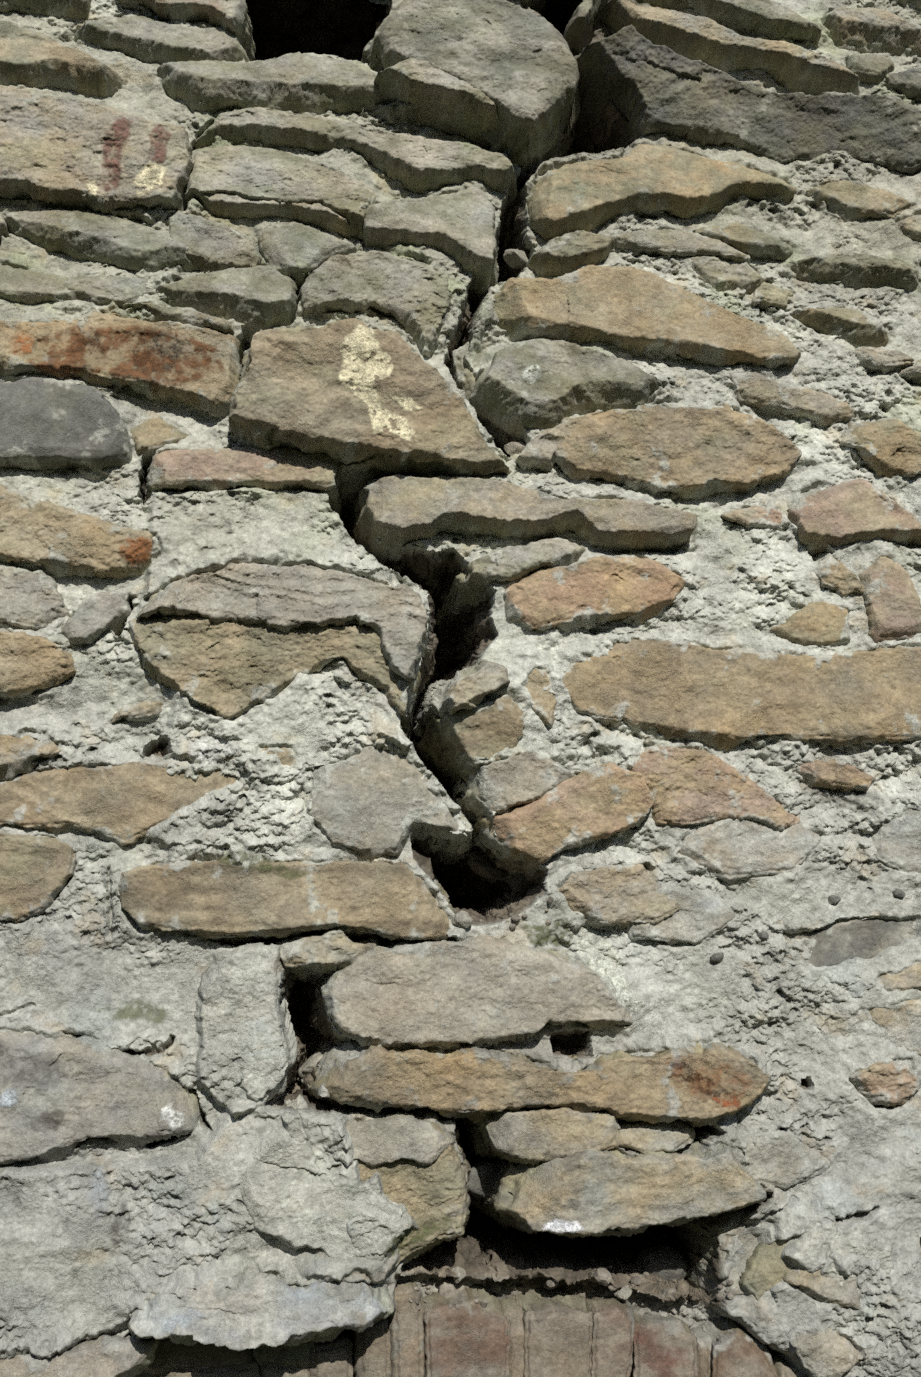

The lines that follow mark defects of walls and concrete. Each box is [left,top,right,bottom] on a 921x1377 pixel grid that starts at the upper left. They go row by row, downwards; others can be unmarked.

crack [522,0,583,35]
crack [443,85,643,459]
crack [327,491,557,941]
crack [205,929,385,1118]
crack [419,1114,454,1122]